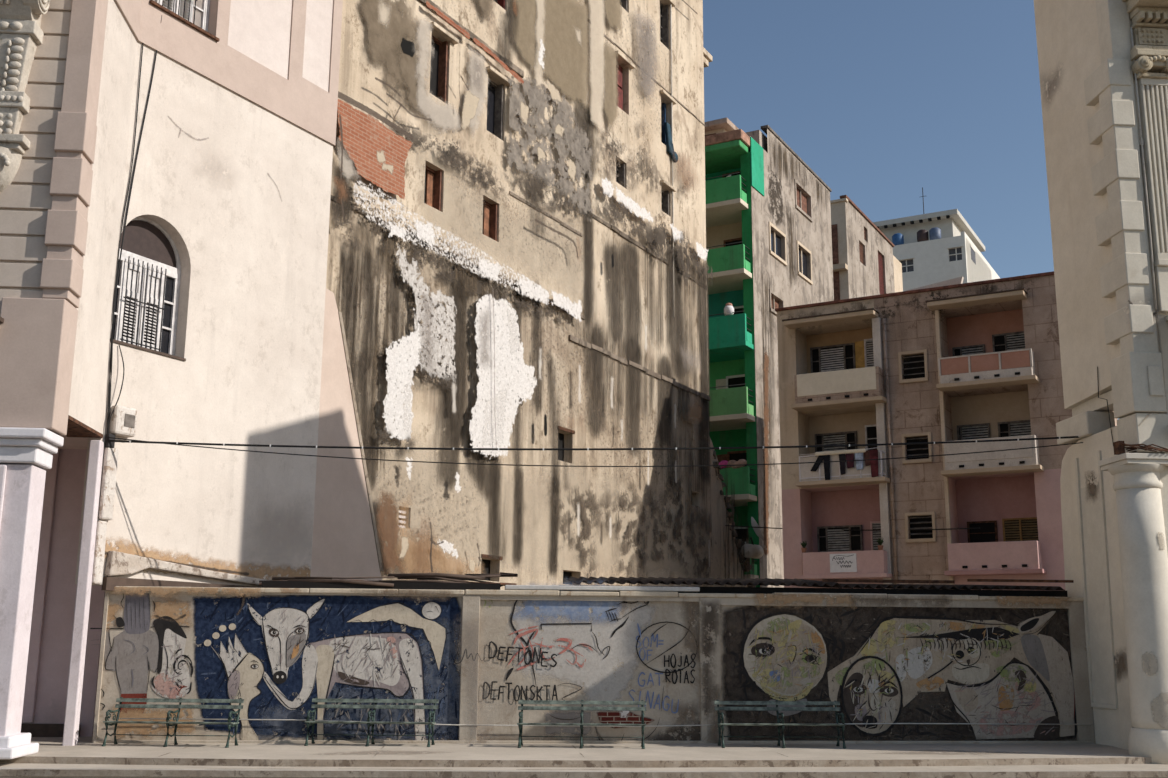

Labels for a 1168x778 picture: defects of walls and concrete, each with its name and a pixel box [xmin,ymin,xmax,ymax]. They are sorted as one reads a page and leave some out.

peeling [461,79,479,129]
peeling [601,178,653,224]
peeling [337,91,582,479]
water stain [333,15,772,586]
peeling [105,540,311,580]